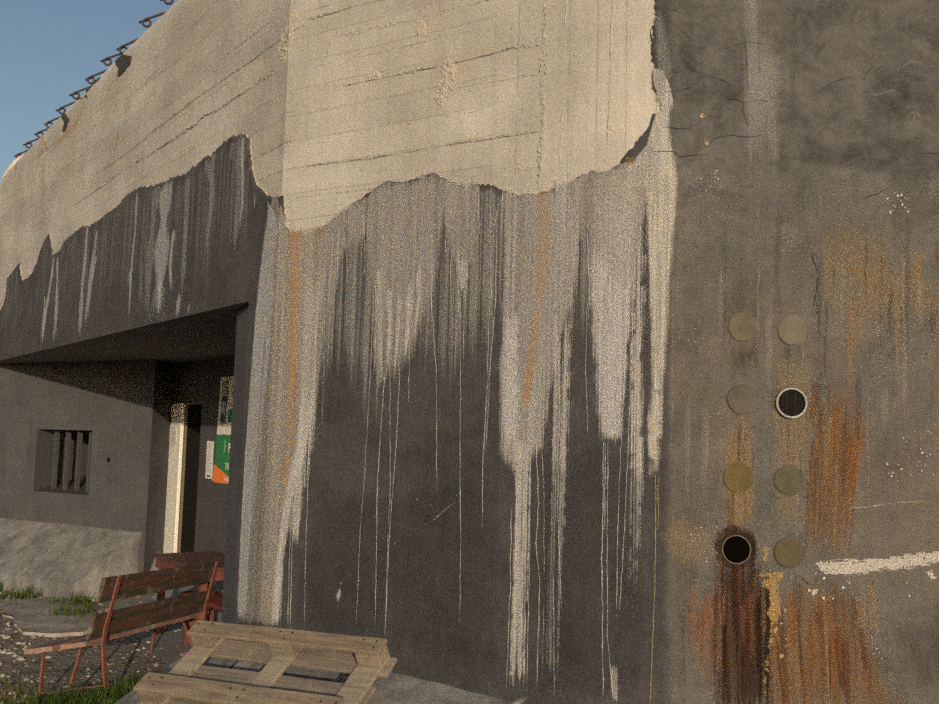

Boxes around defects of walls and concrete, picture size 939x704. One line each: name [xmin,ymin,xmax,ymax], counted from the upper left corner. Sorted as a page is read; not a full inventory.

flaking render [0,0,663,310]
crack [655,42,781,157]
water stain [42,243,63,339]
water stain [85,233,98,315]
water stain [155,184,171,305]
corrosion [284,231,303,483]
water stain [237,172,476,624]
water stain [487,69,675,684]
water stain [602,615,617,700]
corrosion [712,526,782,704]